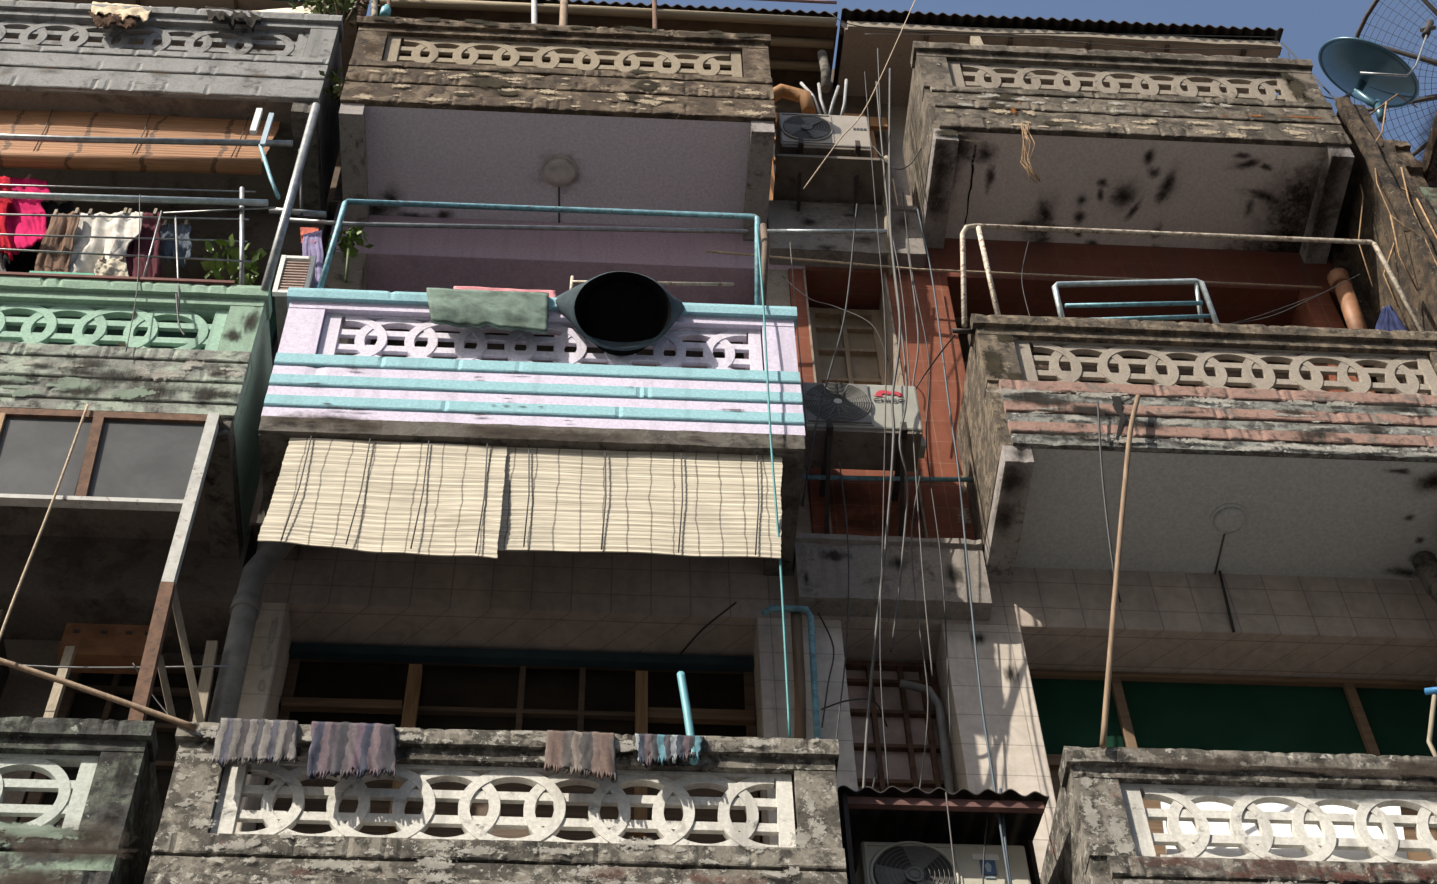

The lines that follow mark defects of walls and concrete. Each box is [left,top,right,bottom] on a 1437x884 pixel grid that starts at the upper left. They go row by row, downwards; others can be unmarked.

peeling [367,68,709,110]
leakage [929,136,994,212]
leakage [1076,180,1137,244]
leakage [1146,152,1174,201]
leakage [1237,153,1271,170]
leakage [1248,147,1354,253]
leakage [1421,119,1437,188]
peeling [0,357,245,400]
peeling [986,387,1437,456]
peeling [175,785,380,884]
peeling [412,840,502,884]
peeling [528,837,799,884]